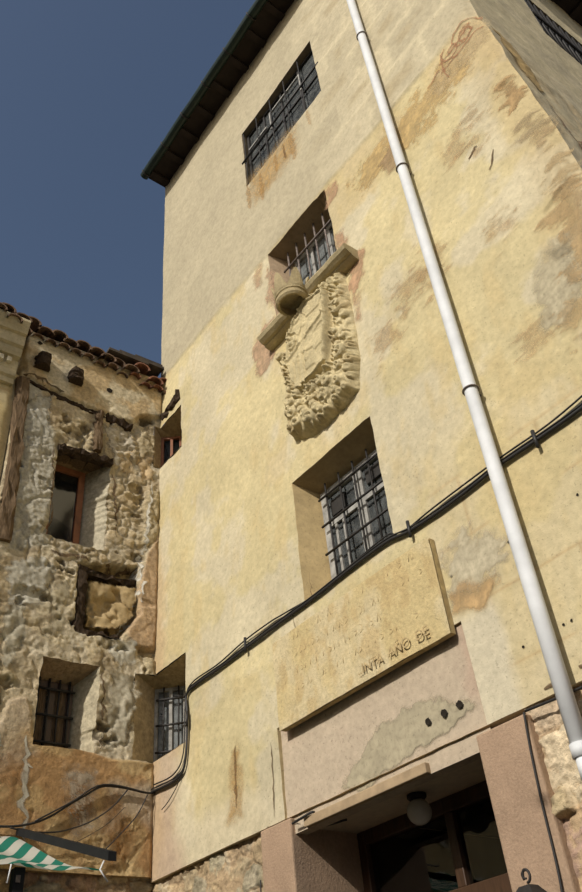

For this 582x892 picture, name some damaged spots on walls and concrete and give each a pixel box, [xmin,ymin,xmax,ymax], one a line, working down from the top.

peeling [536,150,582,281]
crack [17,735,33,840]